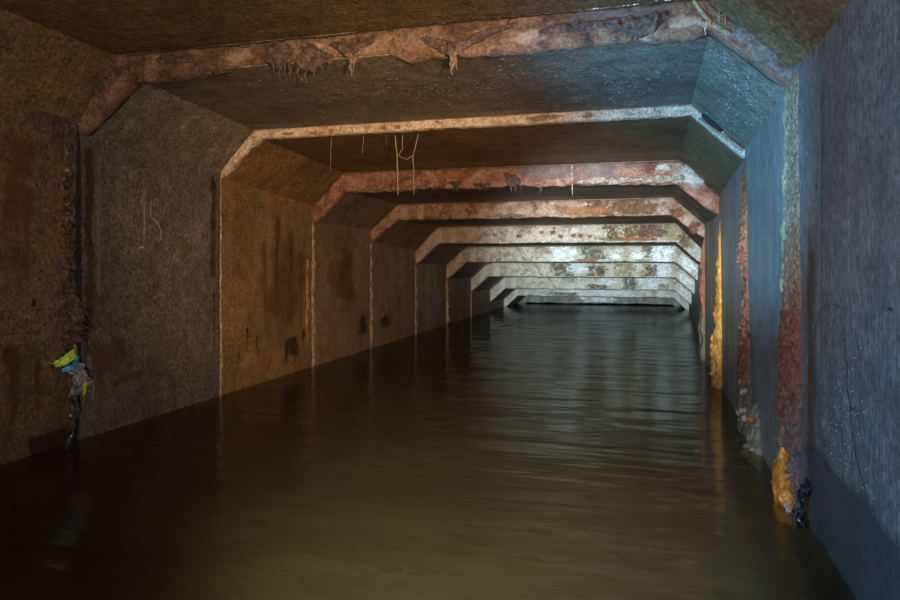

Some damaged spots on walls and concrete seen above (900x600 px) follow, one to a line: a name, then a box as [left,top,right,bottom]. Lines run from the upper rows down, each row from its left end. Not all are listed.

water stain [735,158,763,471]